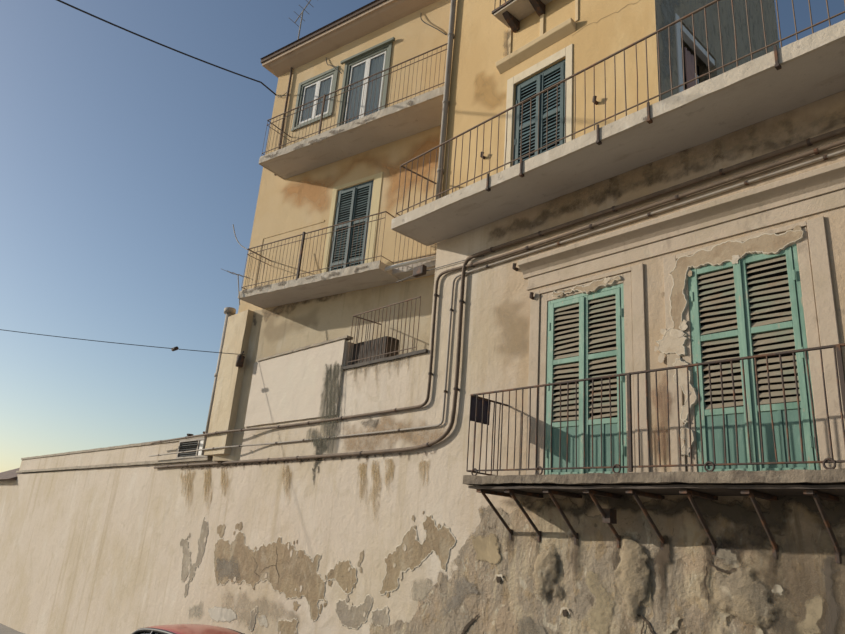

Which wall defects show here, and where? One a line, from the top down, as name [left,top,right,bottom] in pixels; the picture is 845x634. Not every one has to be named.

water stain [287,182,328,207]
water stain [385,141,440,192]
peeling [654,225,805,457]
flaking render [180,496,845,634]
crack [637,614,654,634]
water stain [523,494,845,634]